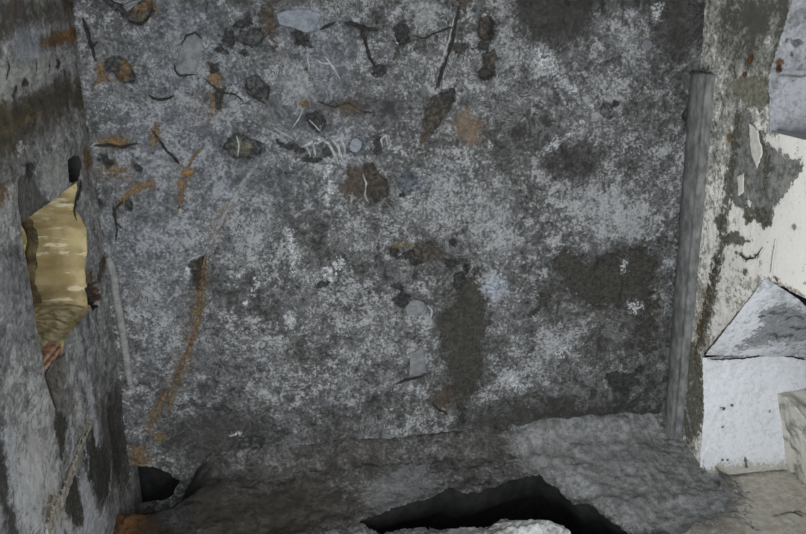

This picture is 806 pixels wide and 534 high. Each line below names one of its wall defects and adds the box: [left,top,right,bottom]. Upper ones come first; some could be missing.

rust [39,27,77,52]
damp [0,73,84,155]
spalling [18,162,50,223]
spalling [68,155,81,184]
flaking render [713,108,804,276]
damp [411,168,601,428]
damp [0,407,24,534]
spalling [138,466,180,502]
spalling [354,474,627,534]